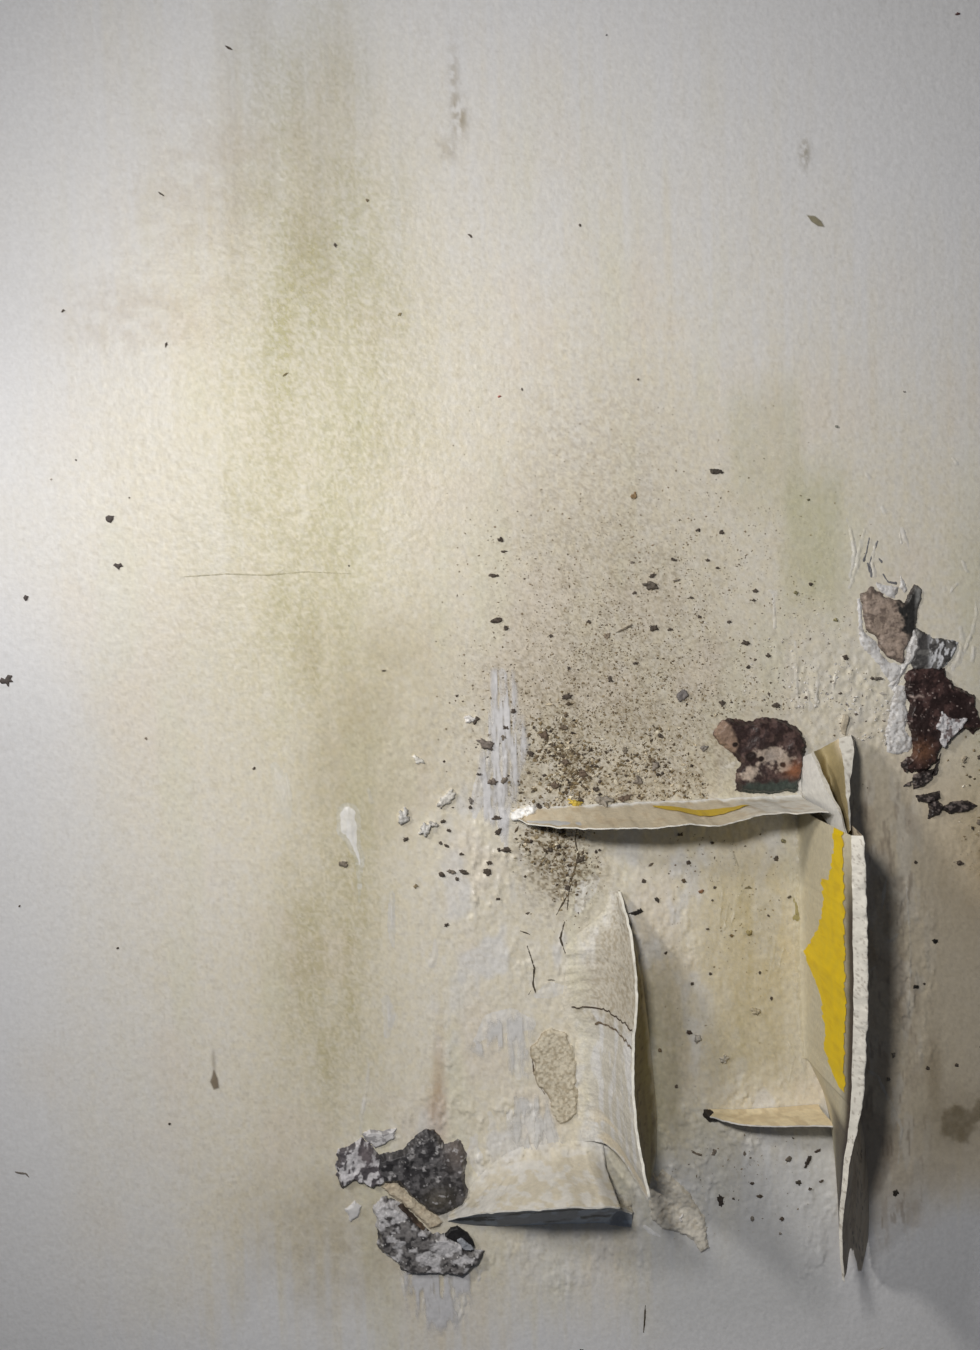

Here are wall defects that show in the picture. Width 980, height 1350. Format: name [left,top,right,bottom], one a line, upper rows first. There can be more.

peeling [335,874,709,1331]
leakage [532,830,587,893]
peeling [398,668,869,1282]